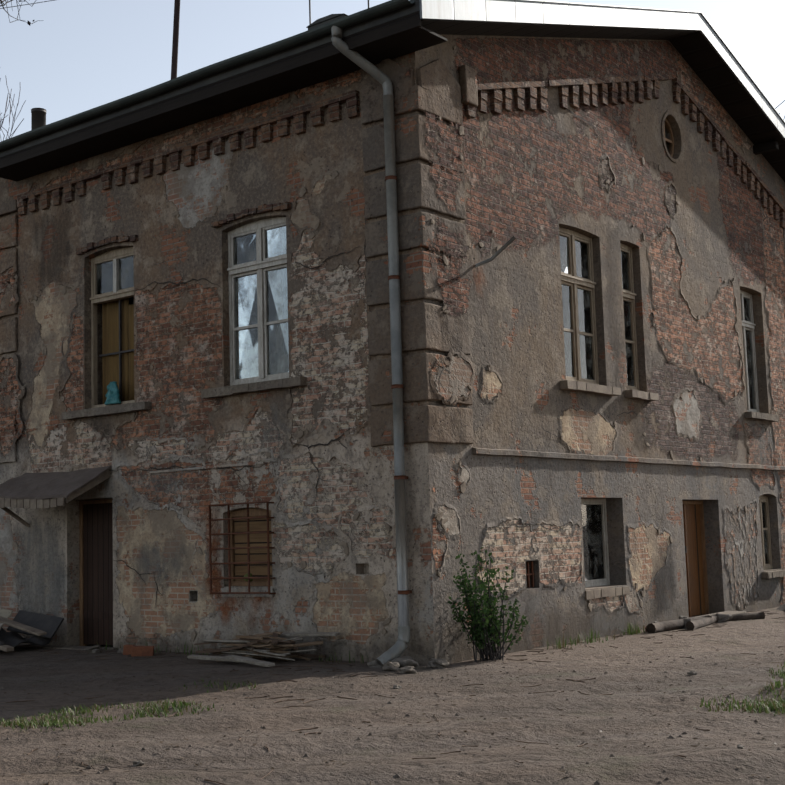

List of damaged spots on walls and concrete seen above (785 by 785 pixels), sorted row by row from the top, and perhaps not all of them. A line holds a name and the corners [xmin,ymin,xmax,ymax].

flaking render [0,171,396,644]
crack [293,428,351,499]
spalling [425,37,785,615]